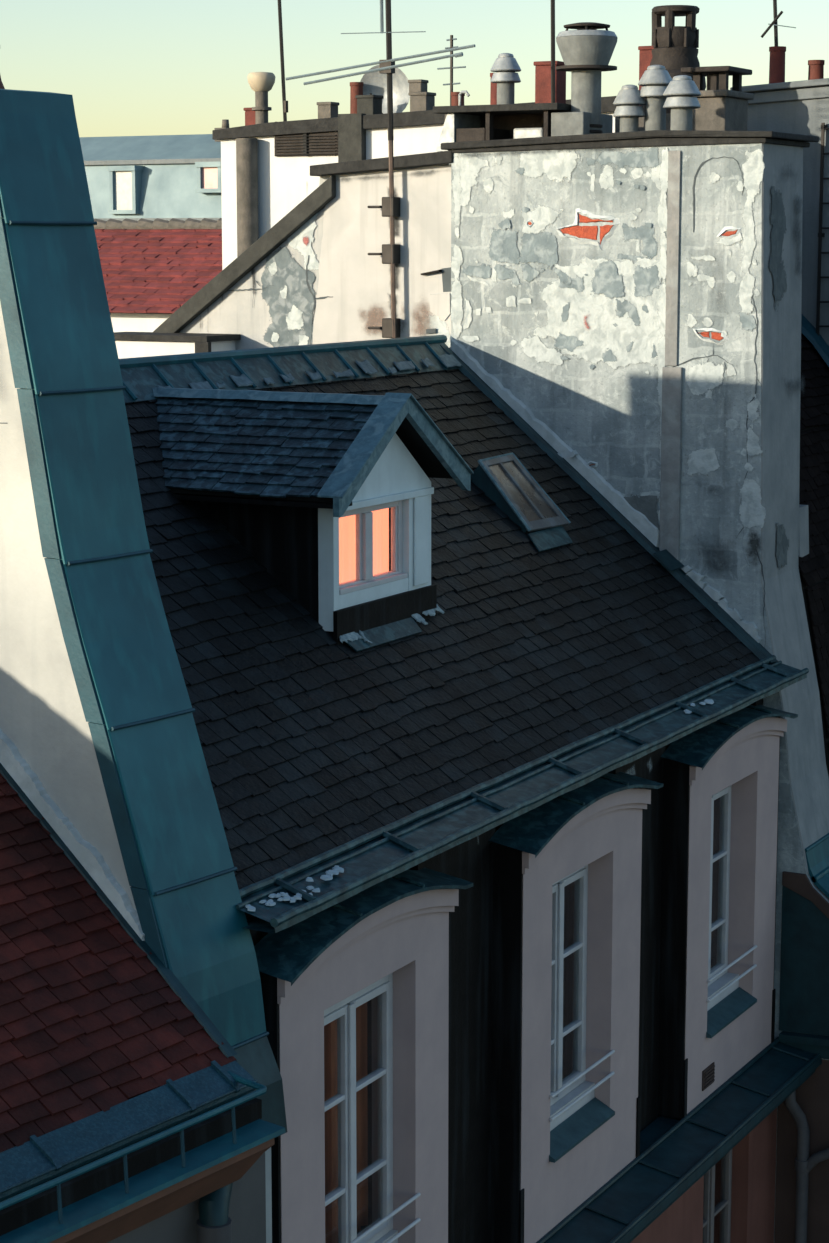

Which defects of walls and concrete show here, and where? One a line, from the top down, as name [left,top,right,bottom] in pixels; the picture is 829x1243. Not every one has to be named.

crack [692,156,744,232]
peeling [687,144,787,331]
peeling [188,147,668,523]
peeling [686,314,736,399]
peeling [685,446,725,476]
peeling [724,394,766,472]
peeling [775,523,789,568]